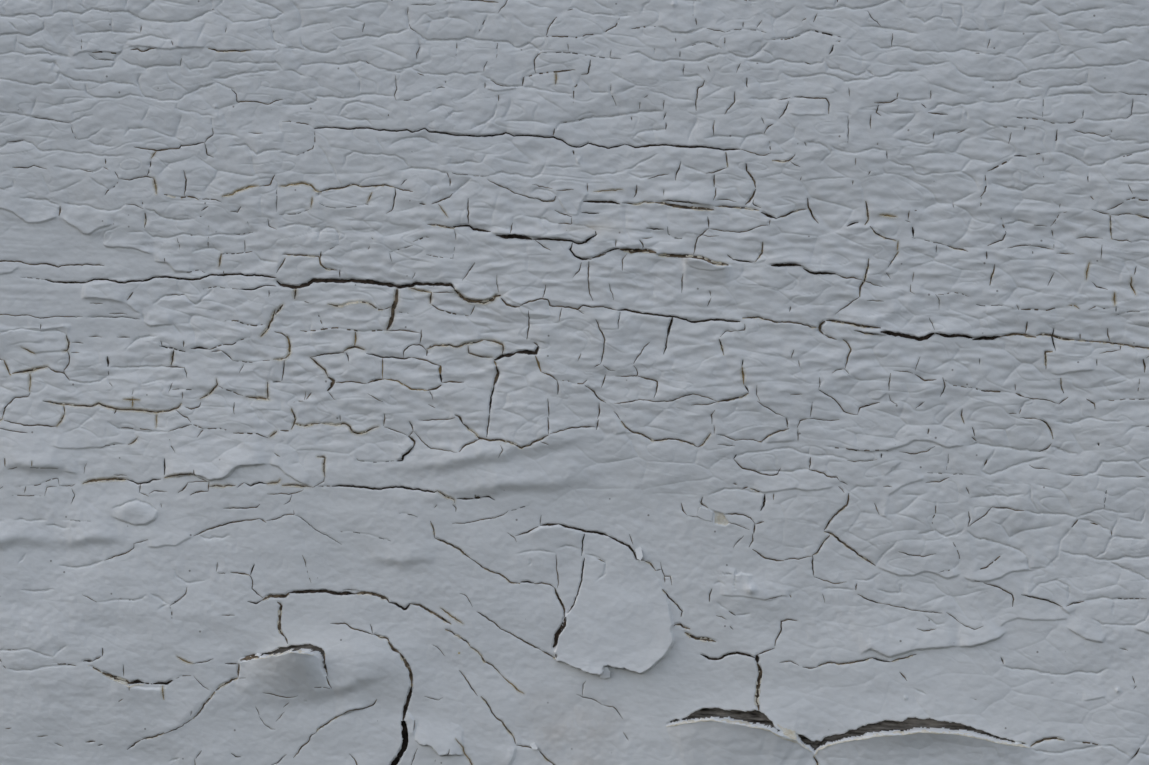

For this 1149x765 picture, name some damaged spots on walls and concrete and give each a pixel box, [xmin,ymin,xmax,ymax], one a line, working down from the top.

crack [81,27,182,66]
crack [208,9,251,53]
crack [470,0,840,107]
crack [0,89,1149,543]
crack [729,457,983,630]
crack [58,557,524,765]
crack [408,514,1083,765]